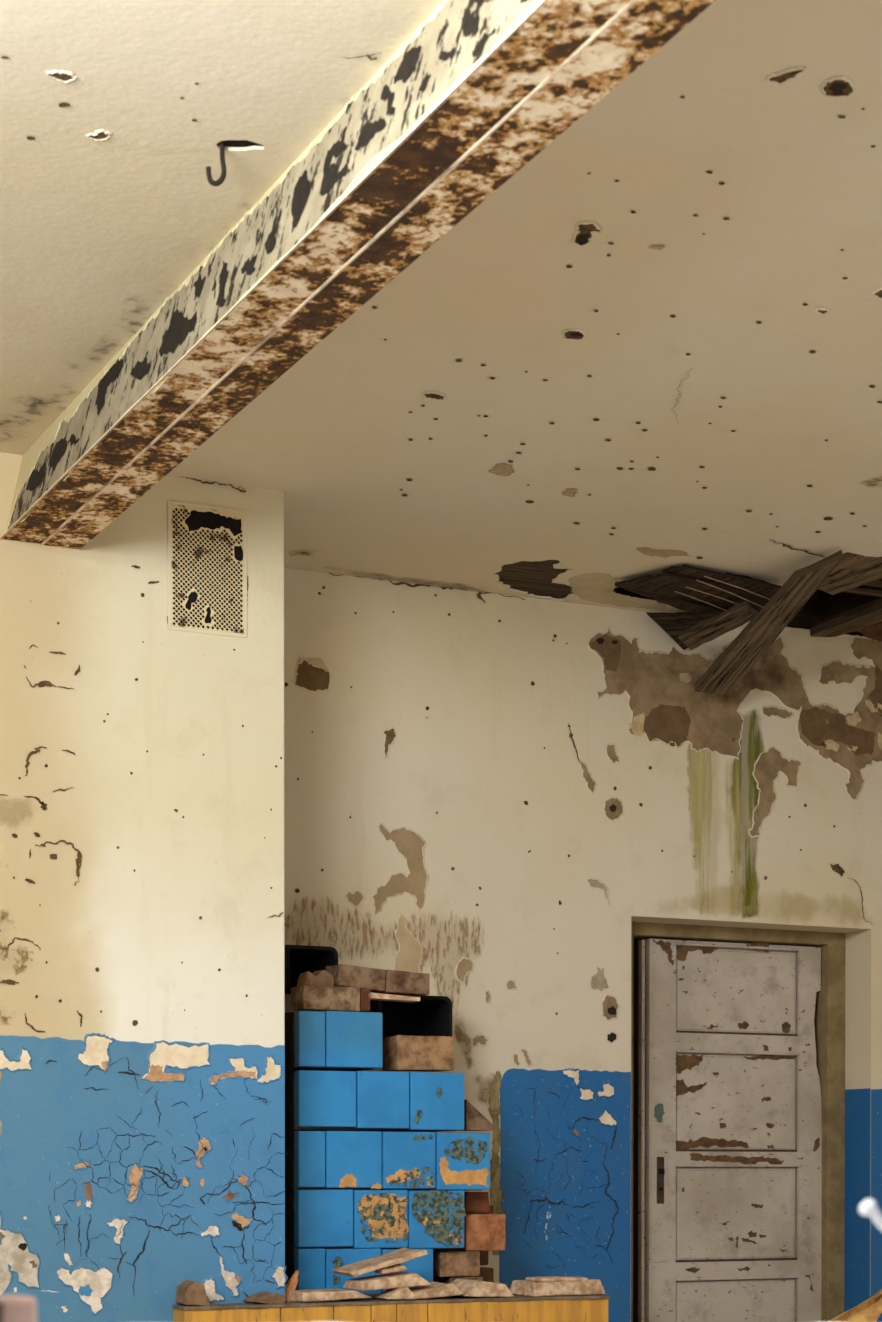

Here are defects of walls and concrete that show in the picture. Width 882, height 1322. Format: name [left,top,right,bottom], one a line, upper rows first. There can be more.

rust [2,0,716,549]
flaking render [284,657,332,693]
flaking render [578,627,882,838]
water stain [689,745,712,858]
peeling [344,823,430,973]
peeling [76,1033,116,1073]
peeling [140,1040,283,1087]
peeling [561,1068,619,1127]
crack [48,1057,287,1303]
crack [518,1088,619,1269]
peeling [0,1209,115,1316]
peeling [202,1254,243,1304]